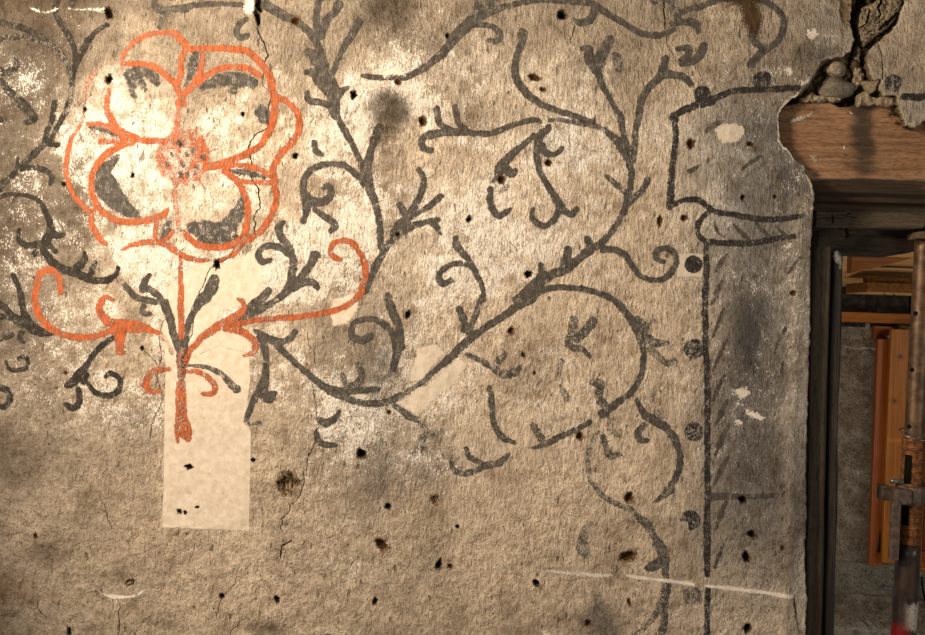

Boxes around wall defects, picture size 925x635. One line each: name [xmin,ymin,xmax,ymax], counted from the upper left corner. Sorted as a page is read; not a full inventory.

flaking render [839,0,851,26]
flaking render [777,66,810,159]
spalling [831,57,880,94]
crack [189,0,275,340]
crack [280,332,319,558]